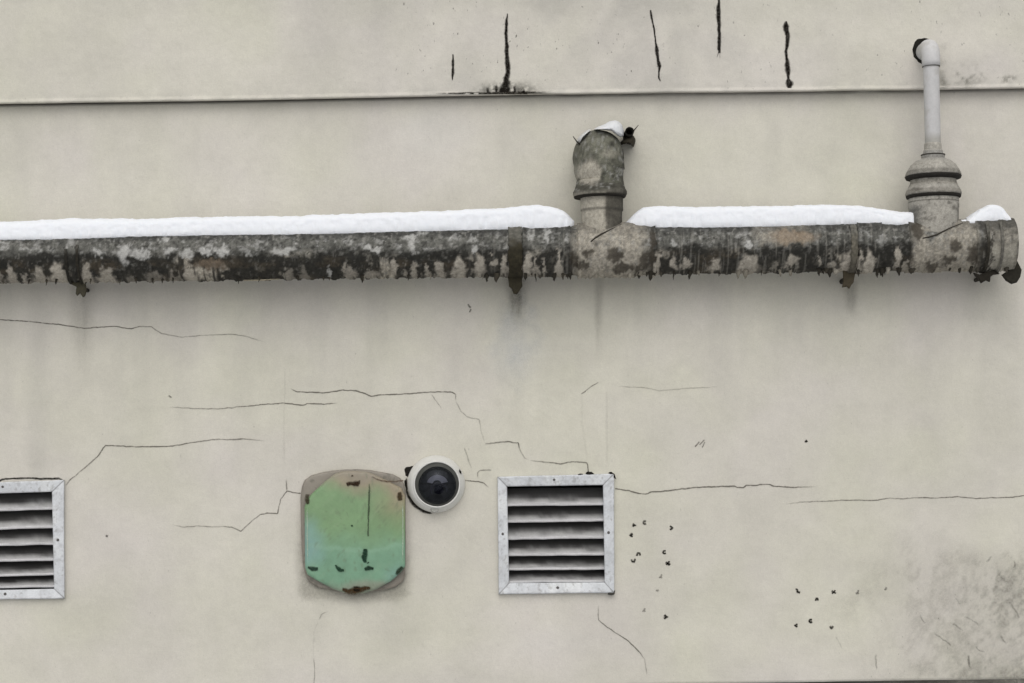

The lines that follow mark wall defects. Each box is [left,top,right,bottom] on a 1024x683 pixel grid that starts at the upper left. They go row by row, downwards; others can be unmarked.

crack [501,14,510,92]
crack [650,10,661,80]
crack [715,0,723,54]
crack [783,21,793,88]
crack [0,319,153,329]
crack [204,389,455,409]
crack [0,438,243,481]
crack [225,484,301,531]
crack [615,484,1024,502]